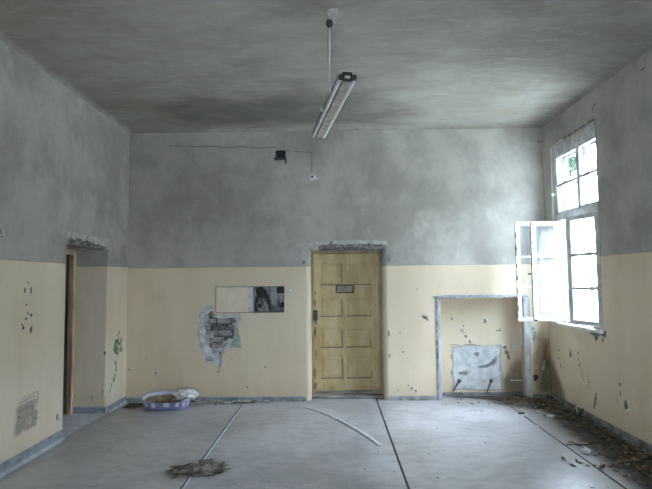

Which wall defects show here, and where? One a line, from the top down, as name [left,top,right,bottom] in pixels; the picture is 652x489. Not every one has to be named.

spalling [66,231,111,250]
spalling [301,240,391,264]
spalling [197,305,241,373]
flaking render [451,325,510,390]